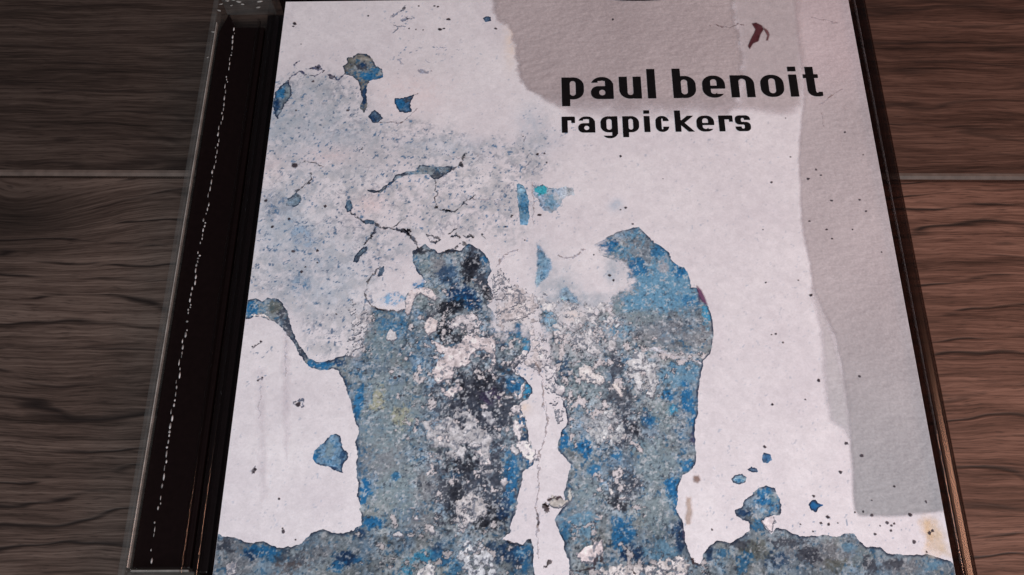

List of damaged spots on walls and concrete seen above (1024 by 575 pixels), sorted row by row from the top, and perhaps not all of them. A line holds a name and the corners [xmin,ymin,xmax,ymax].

peeling [343,53,383,123]
peeling [394,95,414,113]
crack [350,153,518,265]
peeling [213,227,955,575]
crack [508,361,605,572]